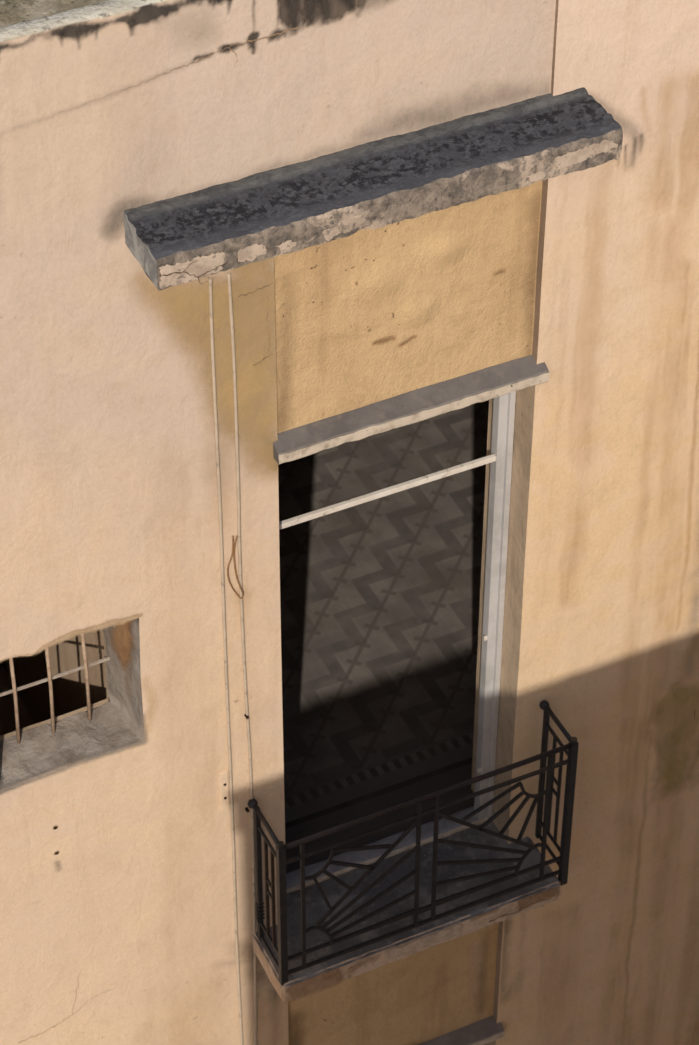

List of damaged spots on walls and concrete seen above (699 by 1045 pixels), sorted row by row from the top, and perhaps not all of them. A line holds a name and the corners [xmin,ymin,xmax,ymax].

damp [51,0,231,39]
damp [278,0,366,28]
crack [72,27,297,109]
peeling [322,226,341,241]
peeling [159,240,297,289]